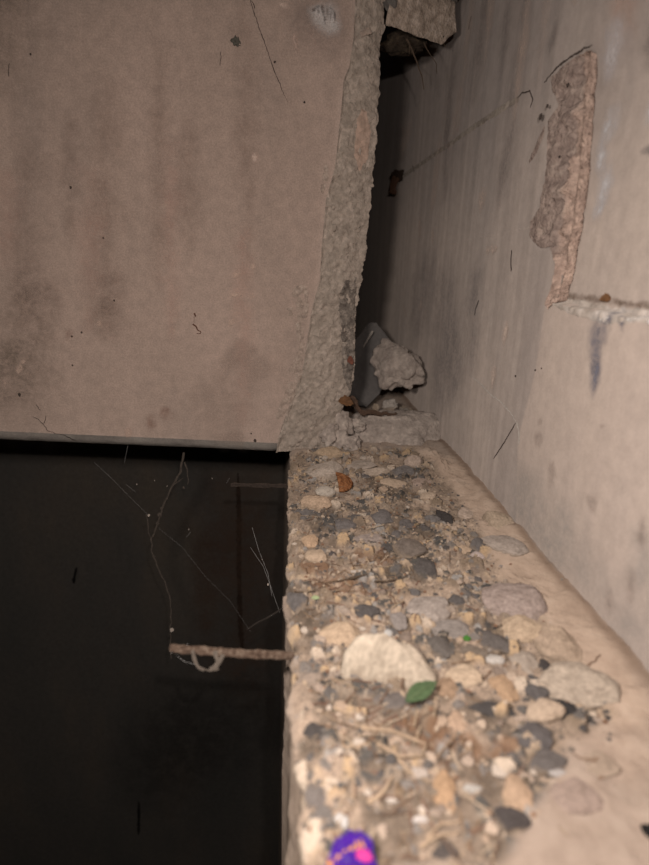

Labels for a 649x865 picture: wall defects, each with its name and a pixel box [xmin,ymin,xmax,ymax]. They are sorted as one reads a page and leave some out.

crack [250,0,287,100]
spalling [529,50,649,325]
spalling [276,0,397,453]
peeling [486,654,505,665]
spalling [548,769,566,778]
peeling [462,784,483,795]
spalling [334,813,349,831]